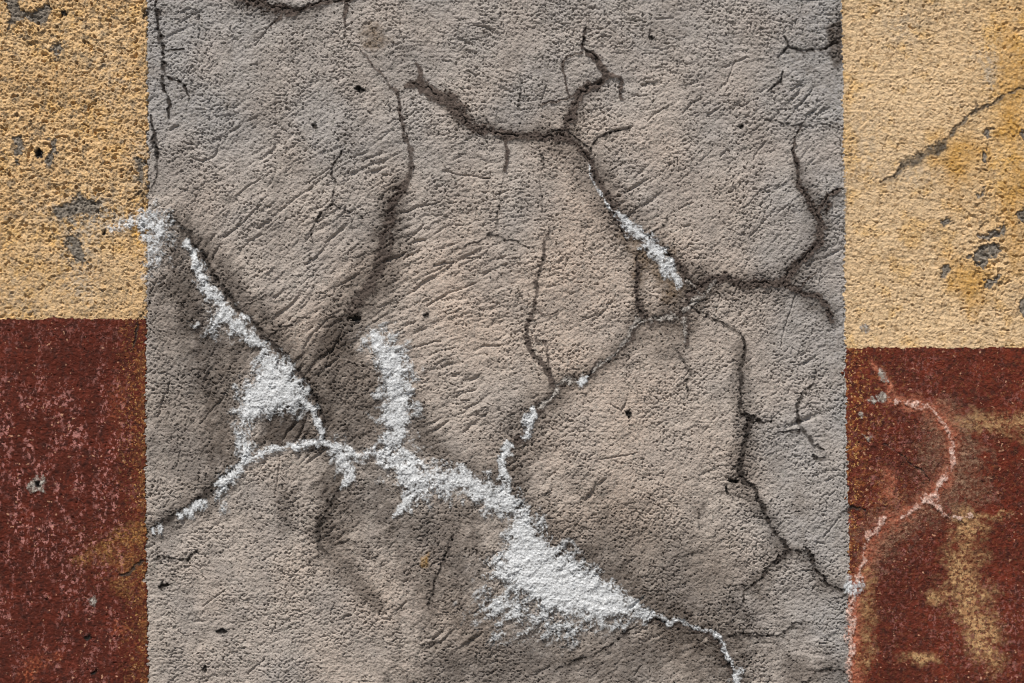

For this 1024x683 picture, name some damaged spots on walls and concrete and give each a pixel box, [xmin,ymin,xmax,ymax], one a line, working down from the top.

peeling [12,135,57,167]
crack [128,0,190,201]
crack [880,87,1024,183]
peeling [64,234,88,266]
peeling [53,192,101,219]
crack [167,213,325,441]
crack [238,0,845,606]
damp [589,165,692,288]
peeling [966,225,1006,289]
damp [105,201,745,683]
crack [120,550,198,576]
crack [556,614,808,683]